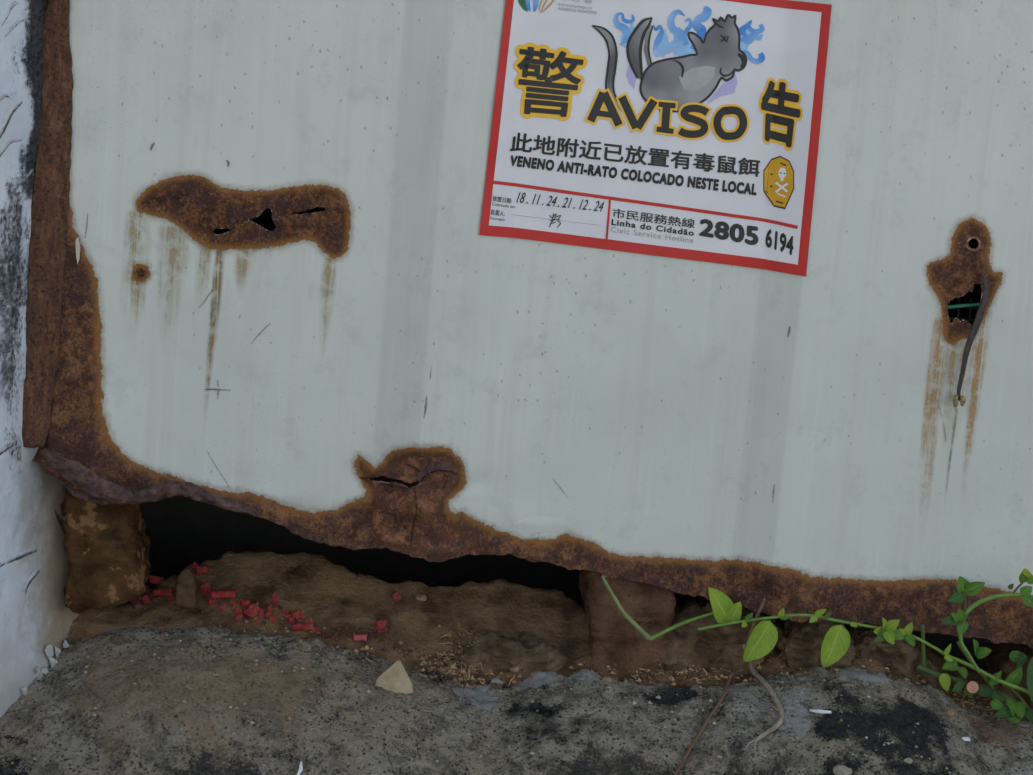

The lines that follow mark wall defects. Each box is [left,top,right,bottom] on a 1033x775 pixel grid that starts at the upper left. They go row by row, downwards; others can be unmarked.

crack [361,464,418,547]
rust [32,174,1033,649]